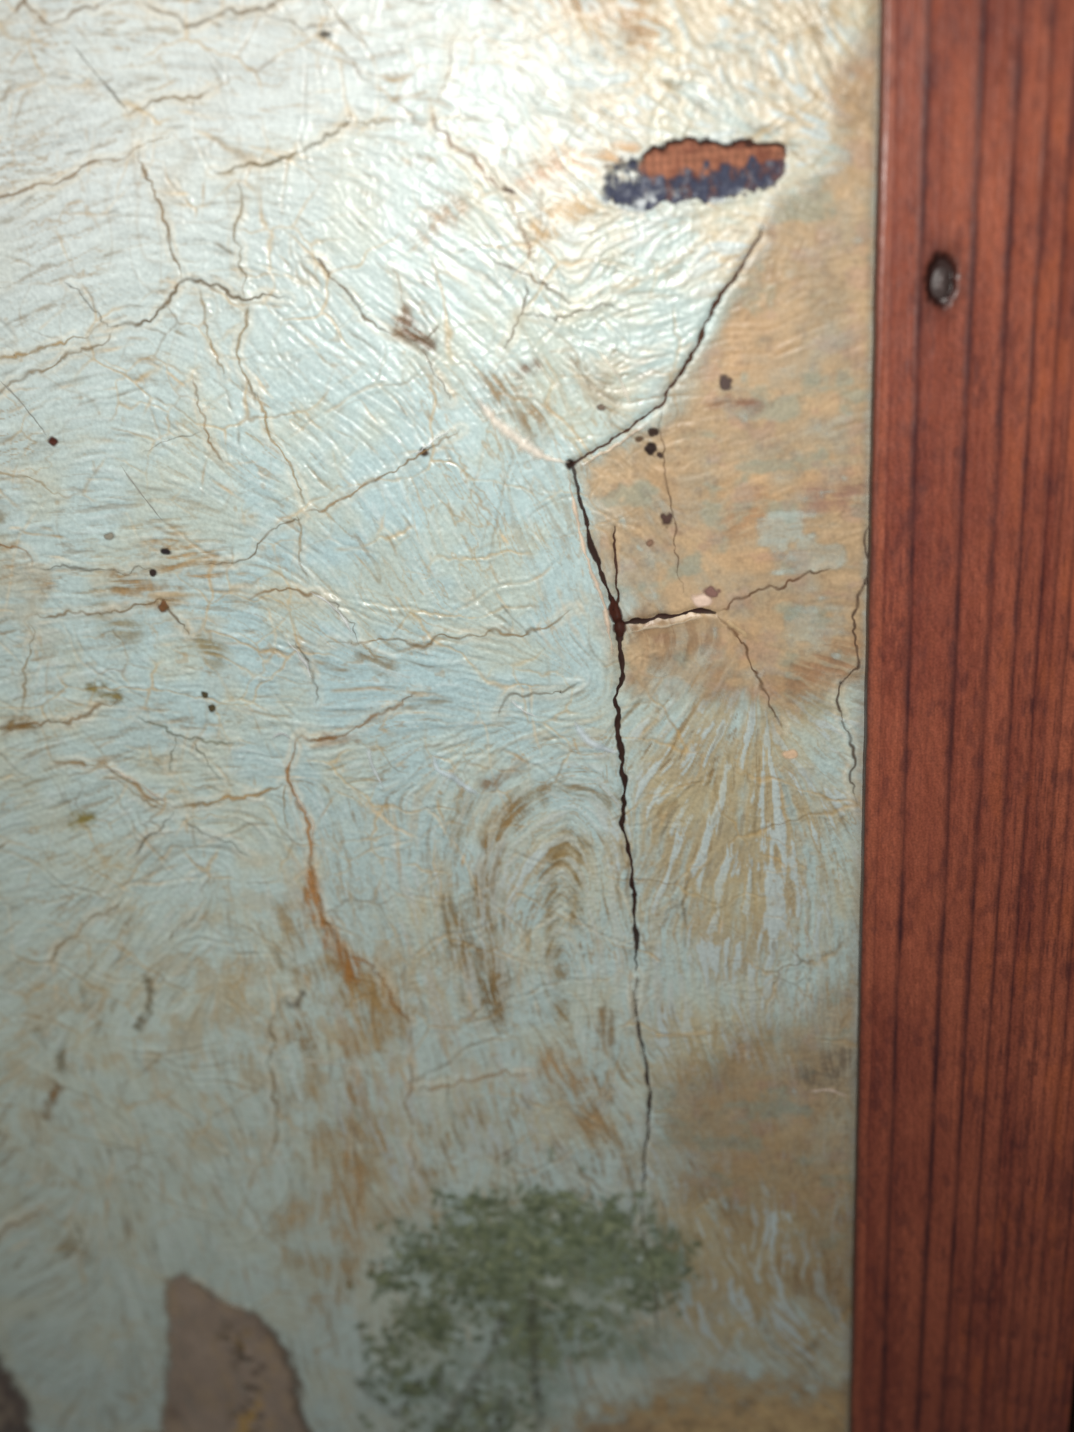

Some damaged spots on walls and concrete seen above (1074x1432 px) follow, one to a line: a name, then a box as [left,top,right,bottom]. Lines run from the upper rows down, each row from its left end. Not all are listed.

peeling [604,136,785,212]
crack [569,230,820,1192]
crack [836,543,868,772]